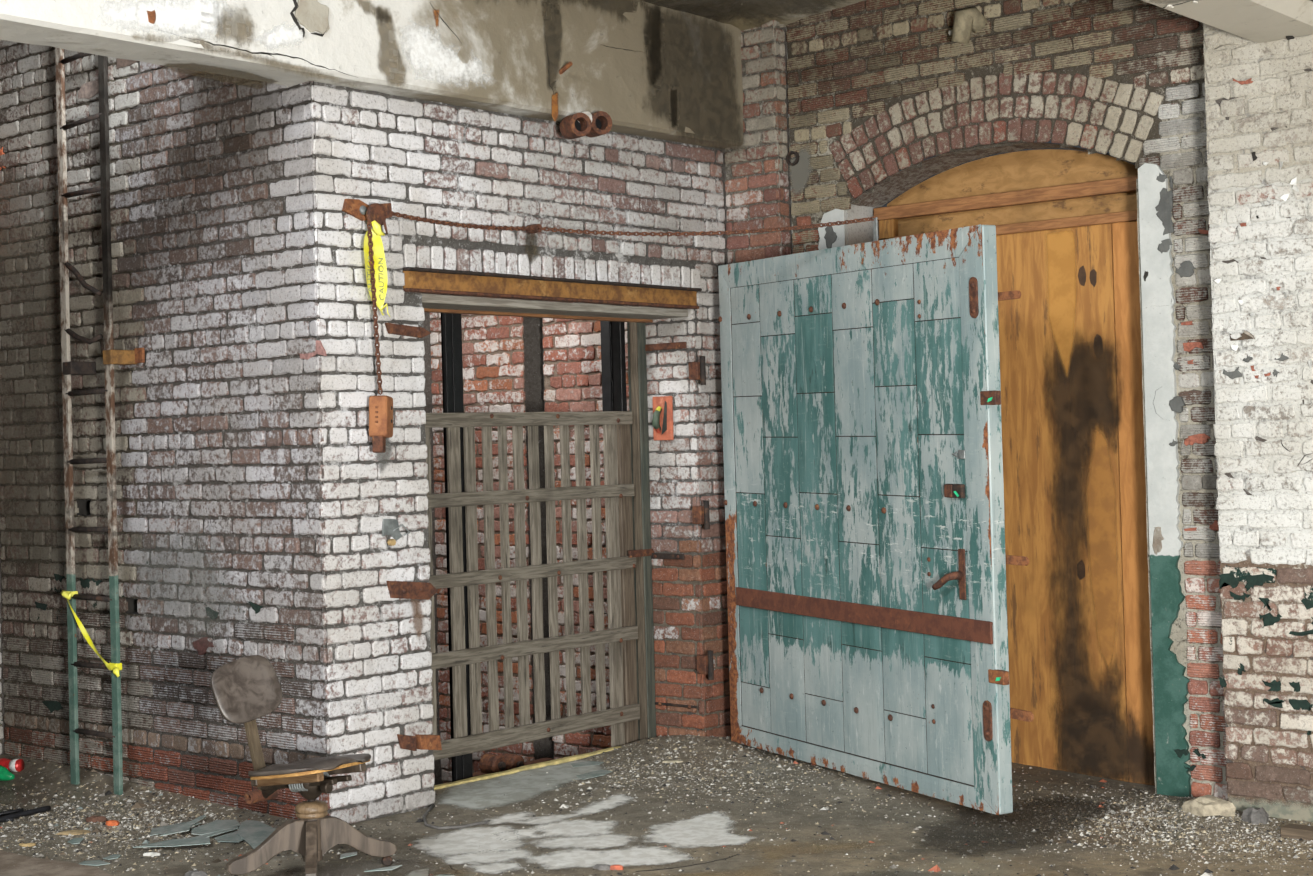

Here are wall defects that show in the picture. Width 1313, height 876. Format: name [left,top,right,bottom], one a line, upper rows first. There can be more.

peeling [290,0,330,37]
peeling [1252,152,1299,204]
peeling [1219,572,1313,636]
peeling [1219,663,1246,688]
peeling [1262,680,1313,711]